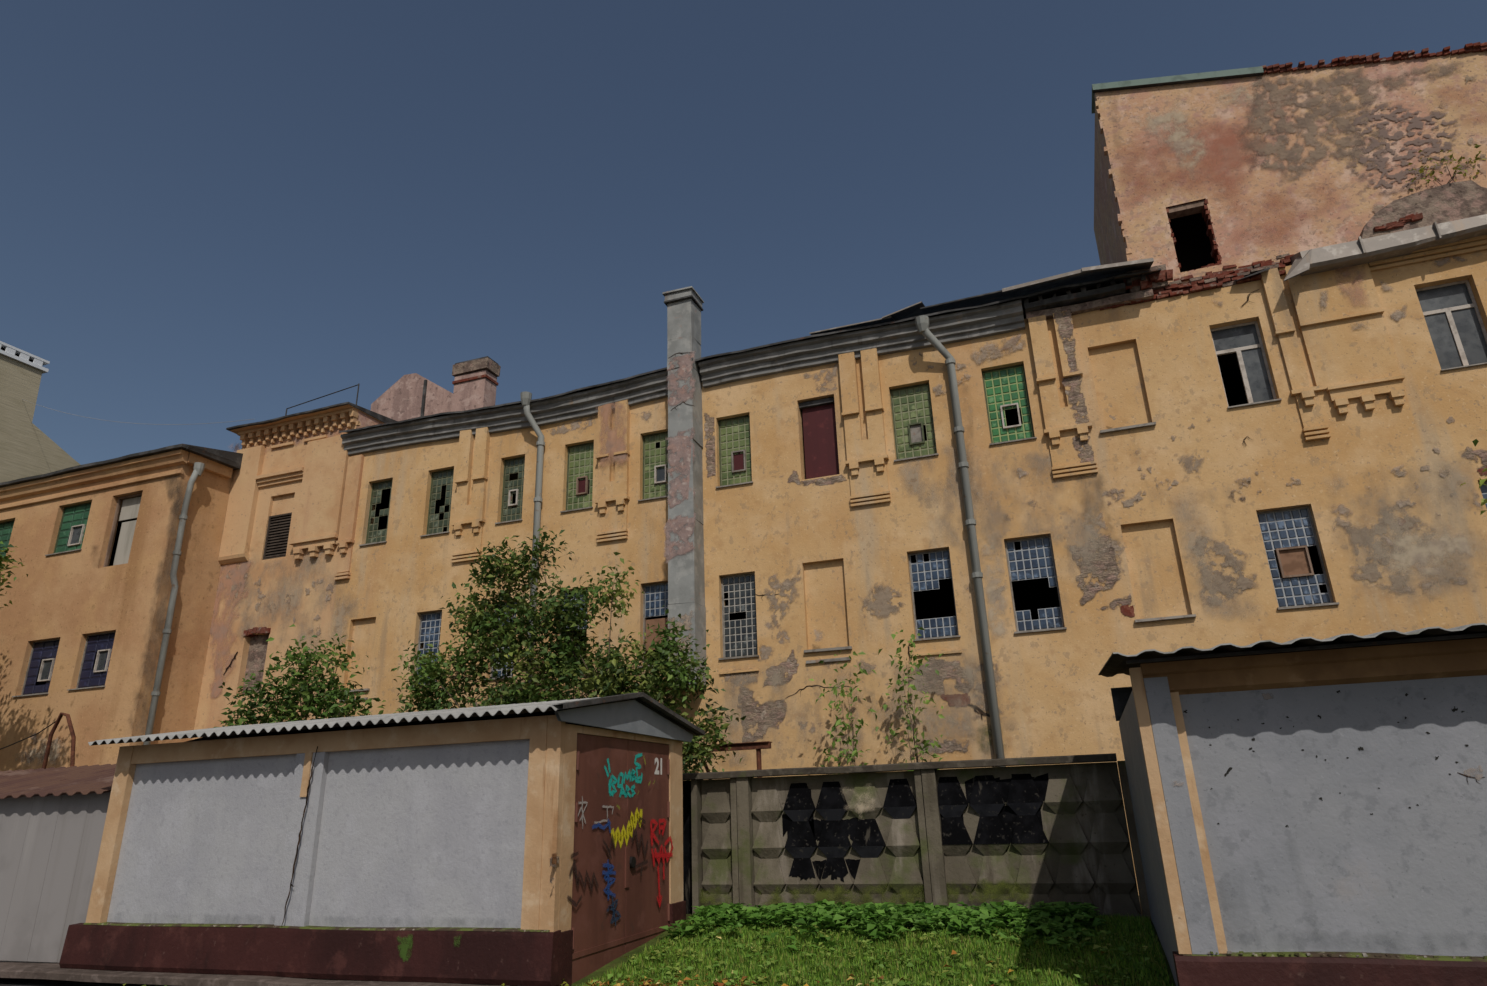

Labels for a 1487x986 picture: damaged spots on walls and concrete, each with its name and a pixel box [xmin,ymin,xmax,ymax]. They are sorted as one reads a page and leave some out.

flaking render [667,352,695,406]
flaking render [666,413,716,508]
spalling [1462,447,1487,476]
peeling [863,585,901,617]
spalling [1066,450,1203,617]
peeling [1193,537,1257,606]
peeling [1334,448,1468,593]
spalling [725,570,821,742]